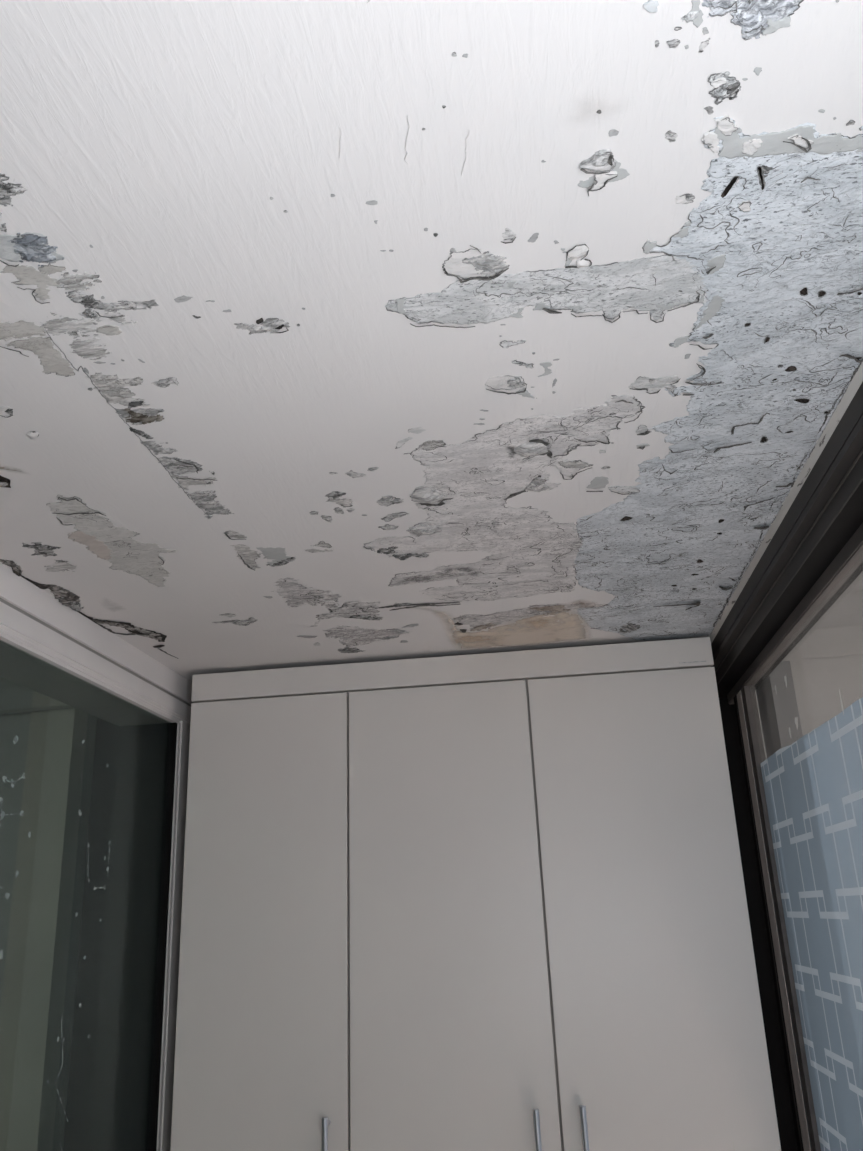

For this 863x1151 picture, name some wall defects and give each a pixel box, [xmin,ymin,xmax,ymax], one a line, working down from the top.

spalling [655,0,804,53]
peeling [0,173,234,519]
peeling [224,67,863,653]
spalling [0,560,23,577]
peeling [22,495,178,612]
spalling [93,620,164,642]
leakage [450,613,583,648]